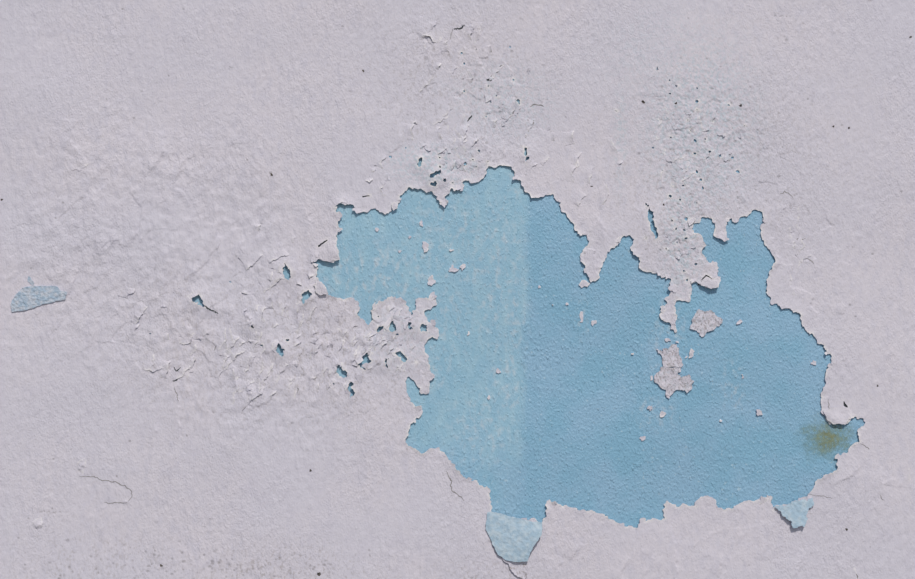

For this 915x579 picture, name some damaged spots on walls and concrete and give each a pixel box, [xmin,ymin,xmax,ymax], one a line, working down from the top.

peeling [11,276,67,312]
peeling [142,165,865,579]